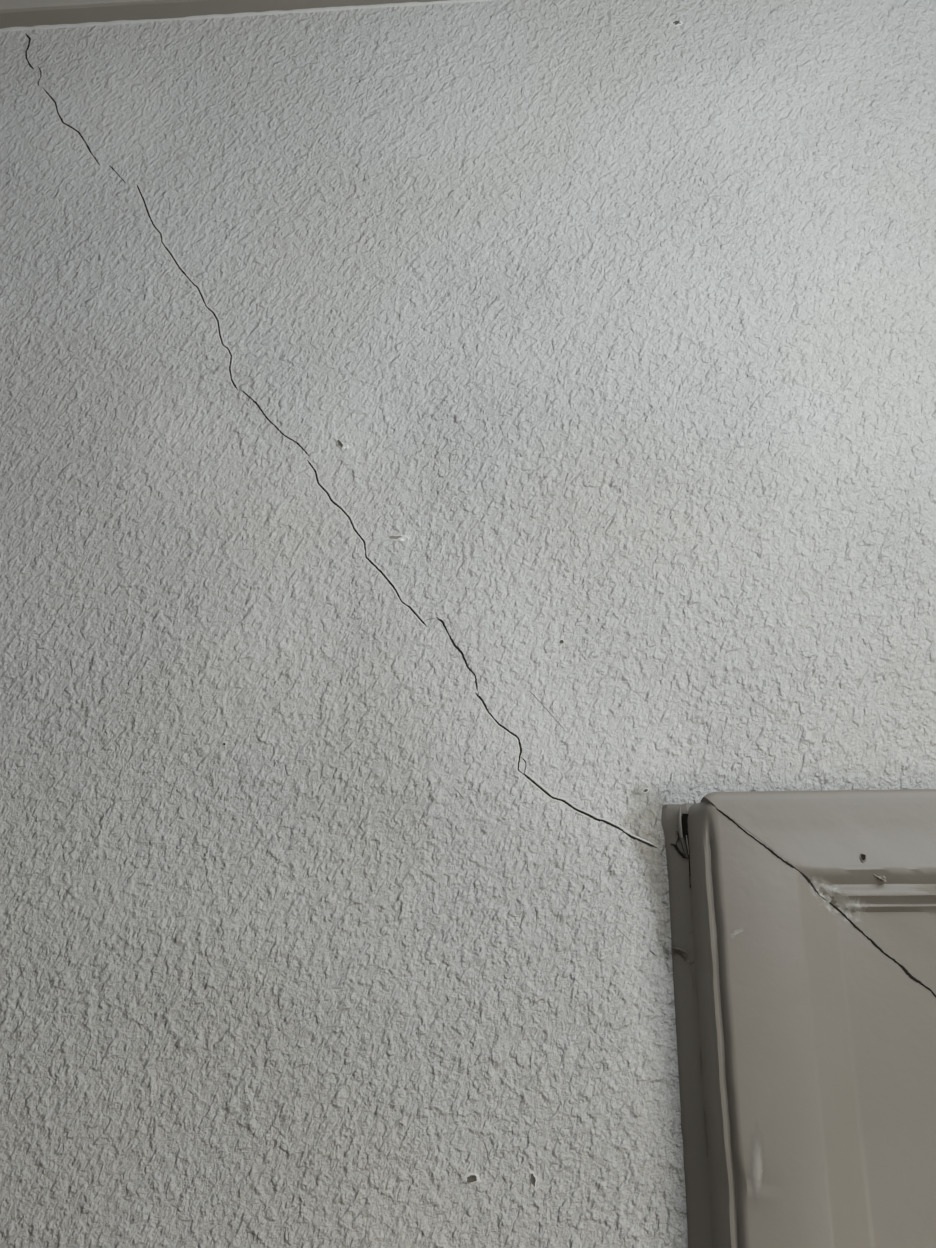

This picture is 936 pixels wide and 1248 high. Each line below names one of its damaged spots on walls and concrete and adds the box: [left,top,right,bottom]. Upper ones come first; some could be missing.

crack [25,33,692,920]